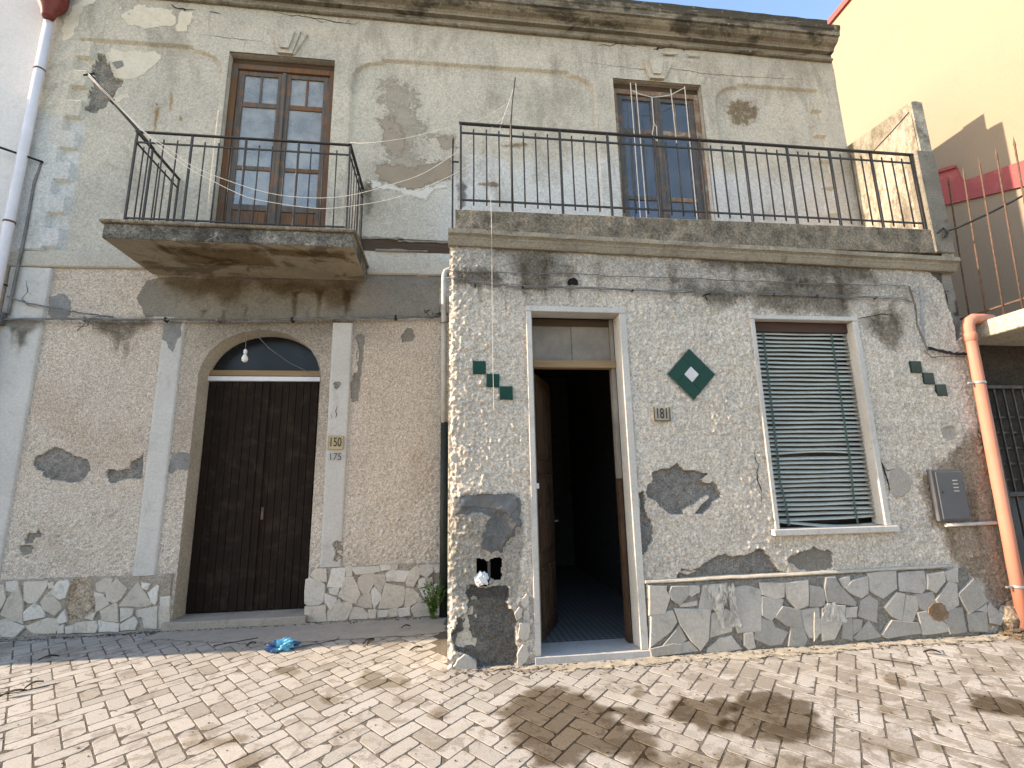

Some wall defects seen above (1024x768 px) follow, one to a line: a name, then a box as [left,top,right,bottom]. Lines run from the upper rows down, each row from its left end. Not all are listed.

peeling [118,4,194,32]
spalling [85,47,161,118]
peeling [366,75,457,200]
spalling [333,333,365,402]
spalling [33,447,91,483]
spalling [106,453,144,483]
spalling [19,529,42,555]
spalling [638,462,722,555]
spalling [677,546,833,578]
spalling [451,557,530,670]